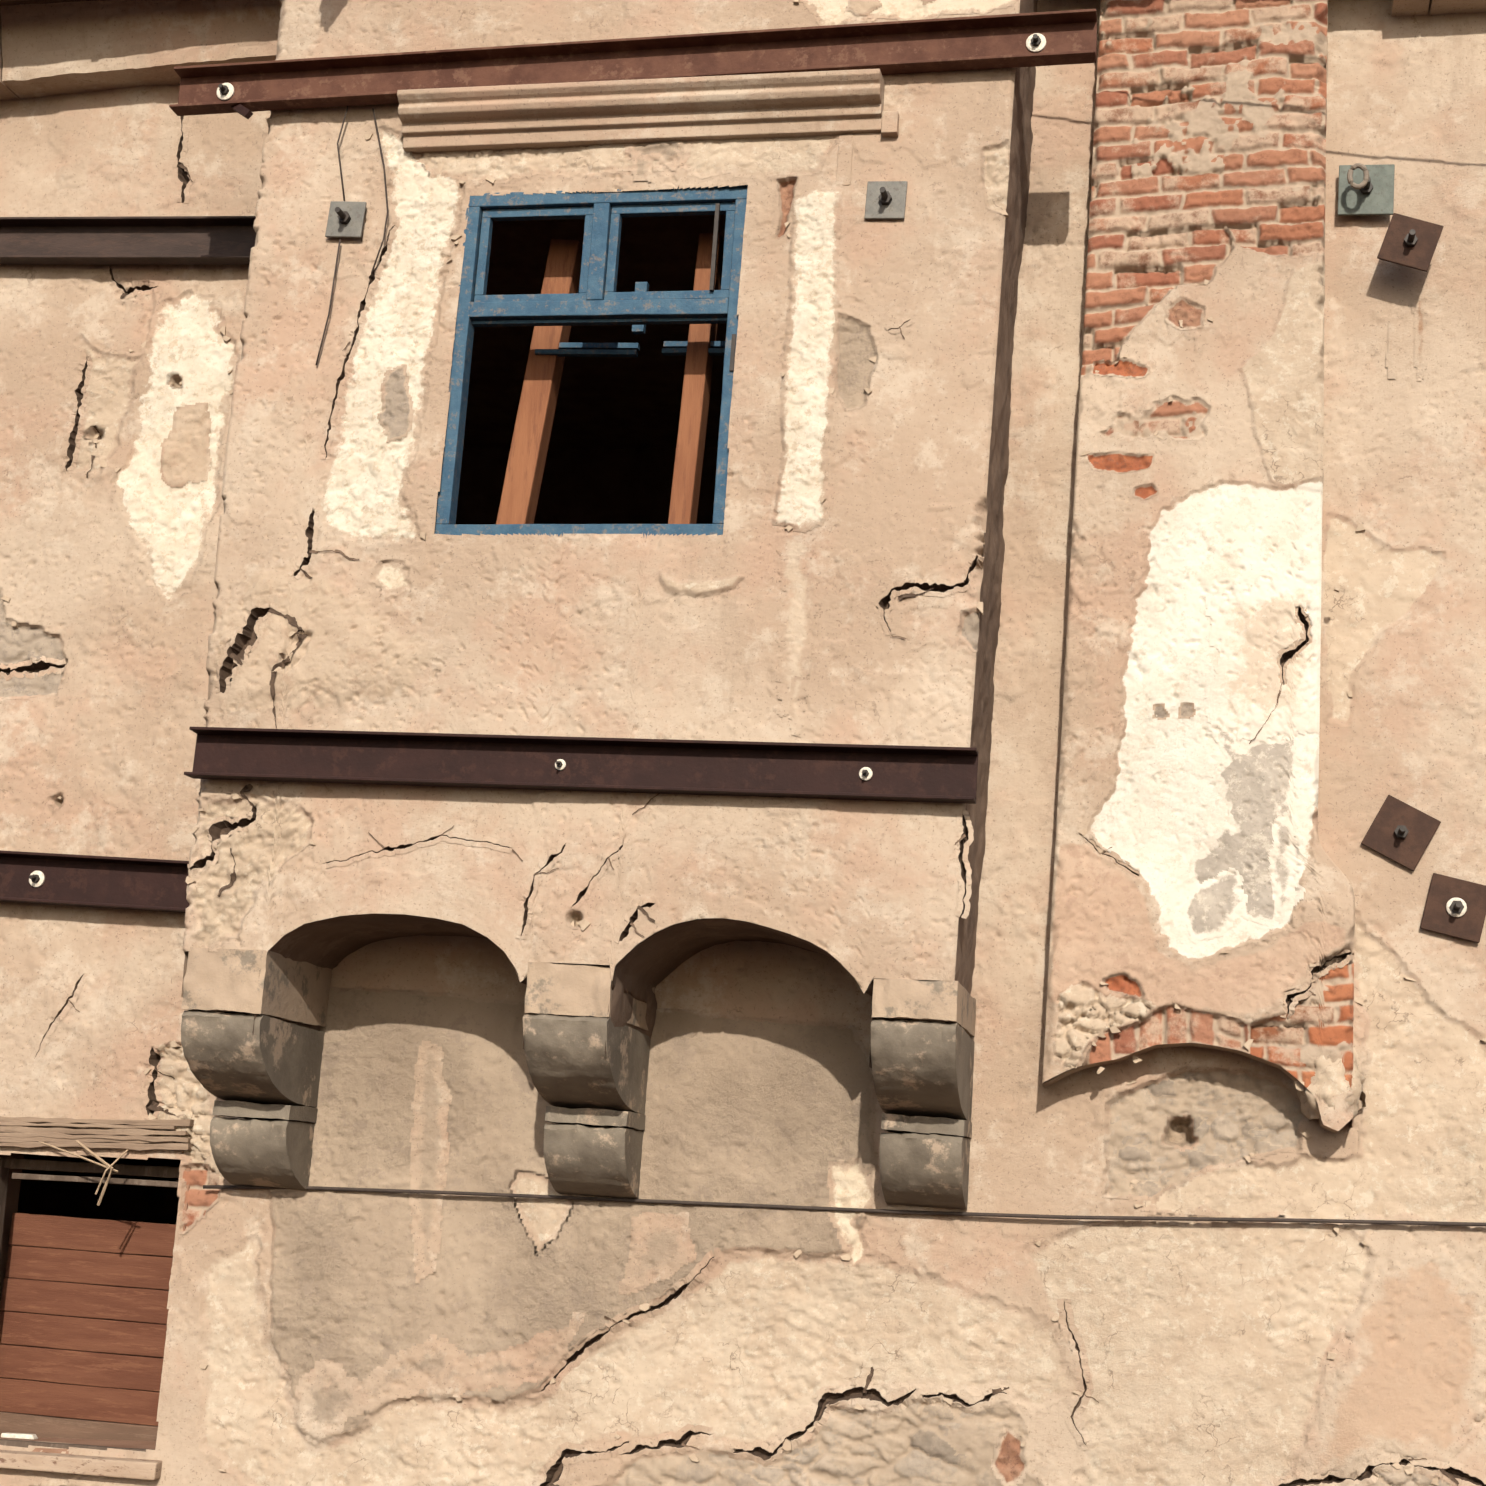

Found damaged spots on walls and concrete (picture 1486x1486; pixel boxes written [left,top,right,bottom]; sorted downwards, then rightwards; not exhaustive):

peeling [66,273,241,607]
crack [215,507,359,728]
peeling [317,125,633,598]
peeling [652,134,878,533]
crack [873,554,984,639]
flaking render [1081,0,1328,379]
peeling [1079,394,1446,963]
crack [1249,605,1312,744]
crack [535,1250,719,1399]
crack [524,1367,1013,1486]
peeling [196,910,1486,1486]
crack [1260,1452,1486,1486]